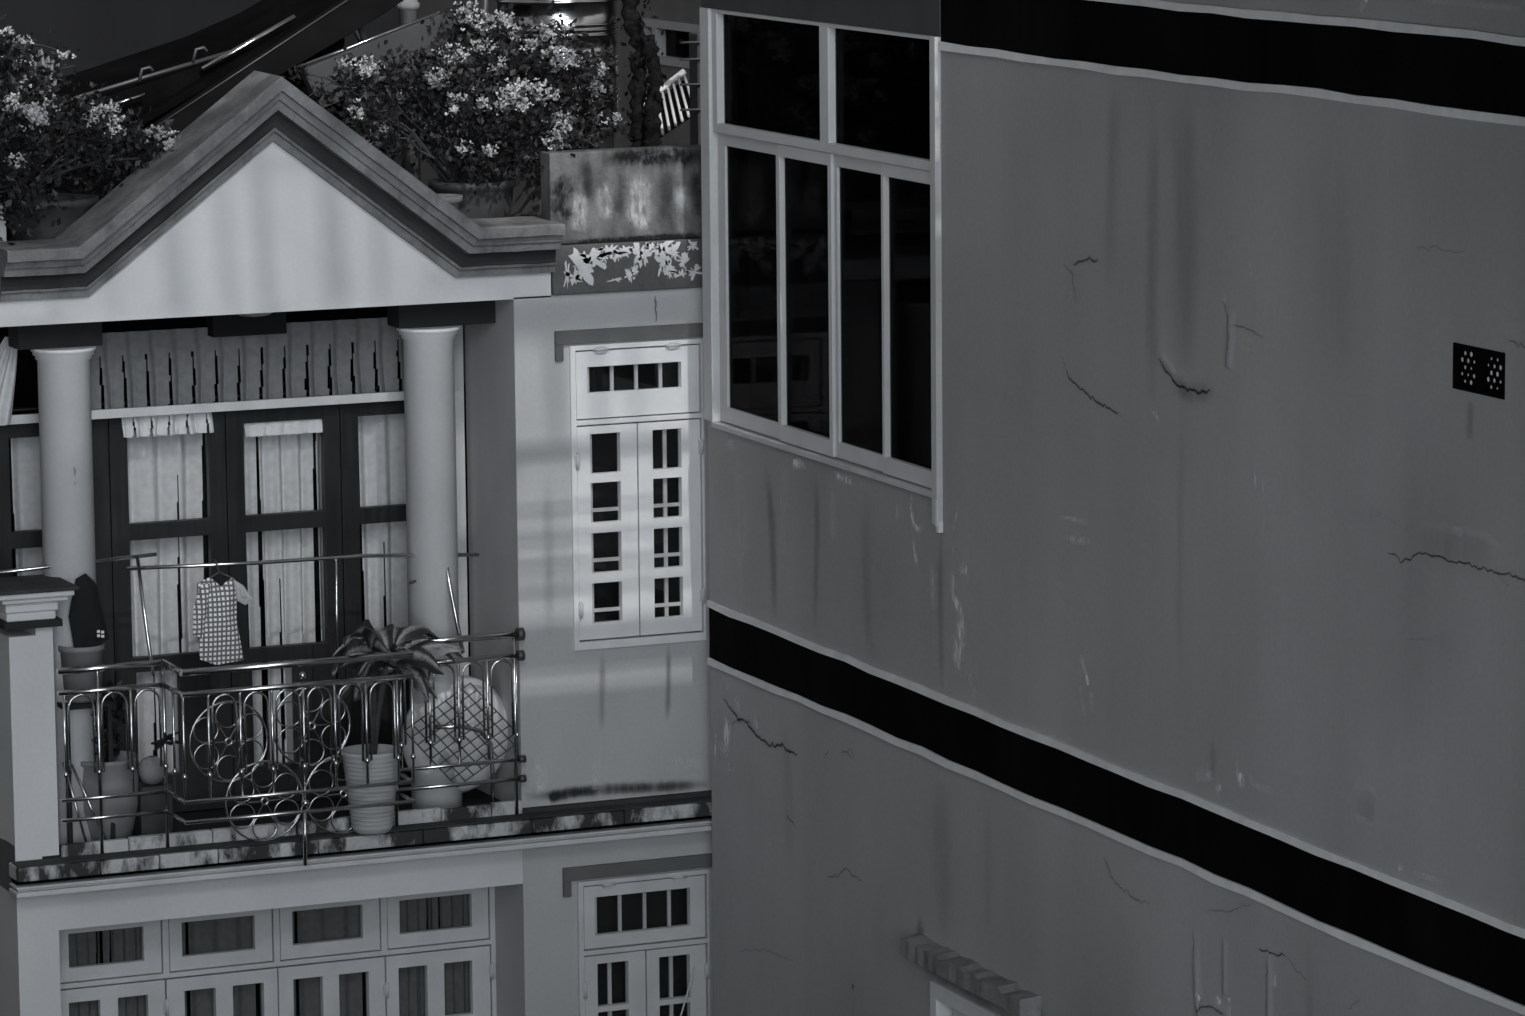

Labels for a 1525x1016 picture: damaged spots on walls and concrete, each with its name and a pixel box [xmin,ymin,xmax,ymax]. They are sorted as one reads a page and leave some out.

water stain [613,147,701,210]
water stain [554,182,588,218]
water stain [578,234,697,244]
crack [1067,373,1117,414]
crack [1391,552,1525,581]
crack [723,699,797,756]